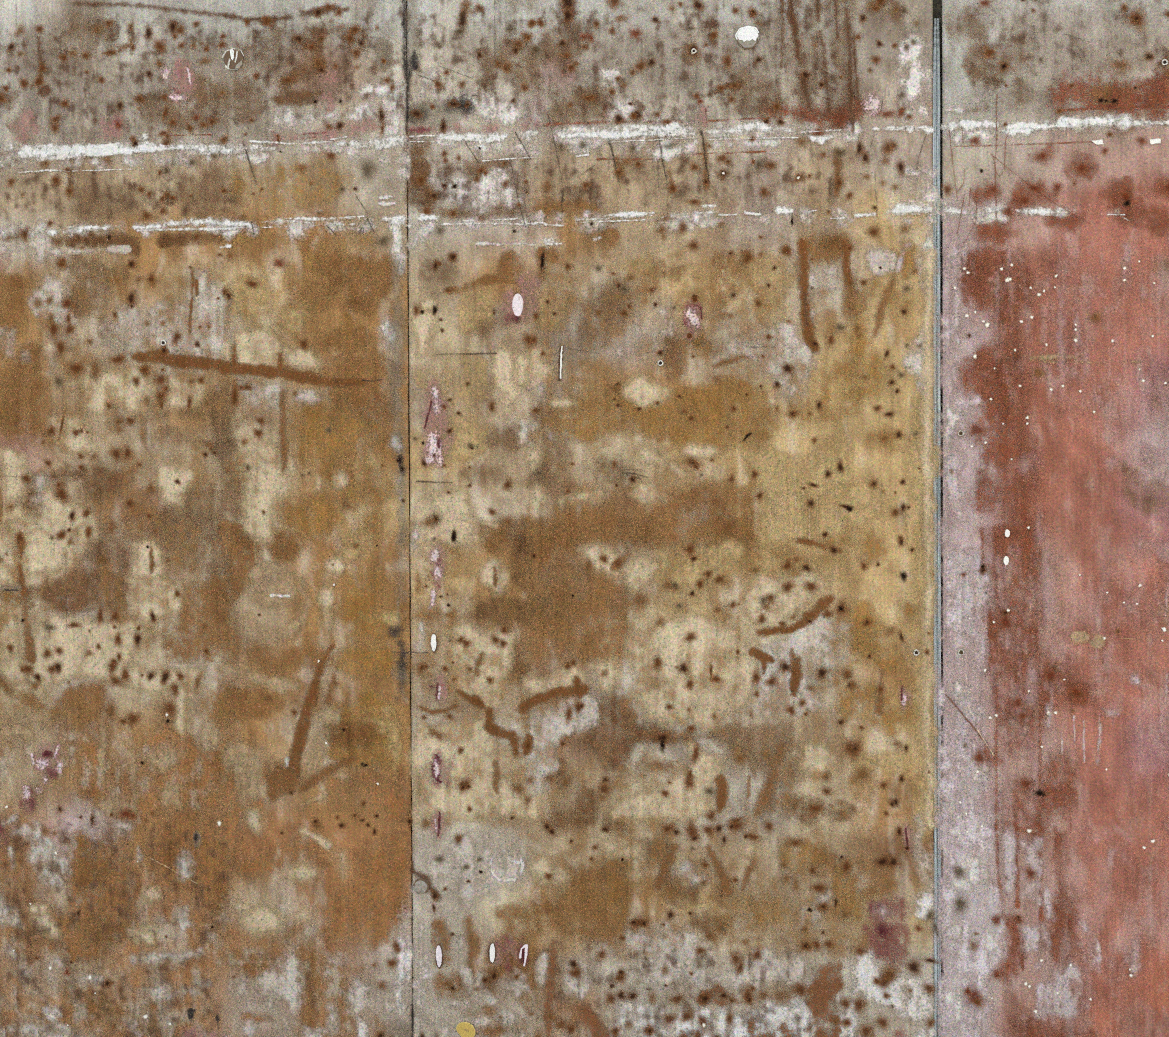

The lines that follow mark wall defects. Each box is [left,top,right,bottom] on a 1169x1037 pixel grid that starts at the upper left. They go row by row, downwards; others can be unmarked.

rust [0,134,373,354]
peeling [0,68,564,275]
rust [0,0,918,249]
rust [949,0,1026,102]
rust [1122,4,1144,28]
rust [957,53,1169,983]
rust [0,226,936,1037]
rust [966,988,983,1006]